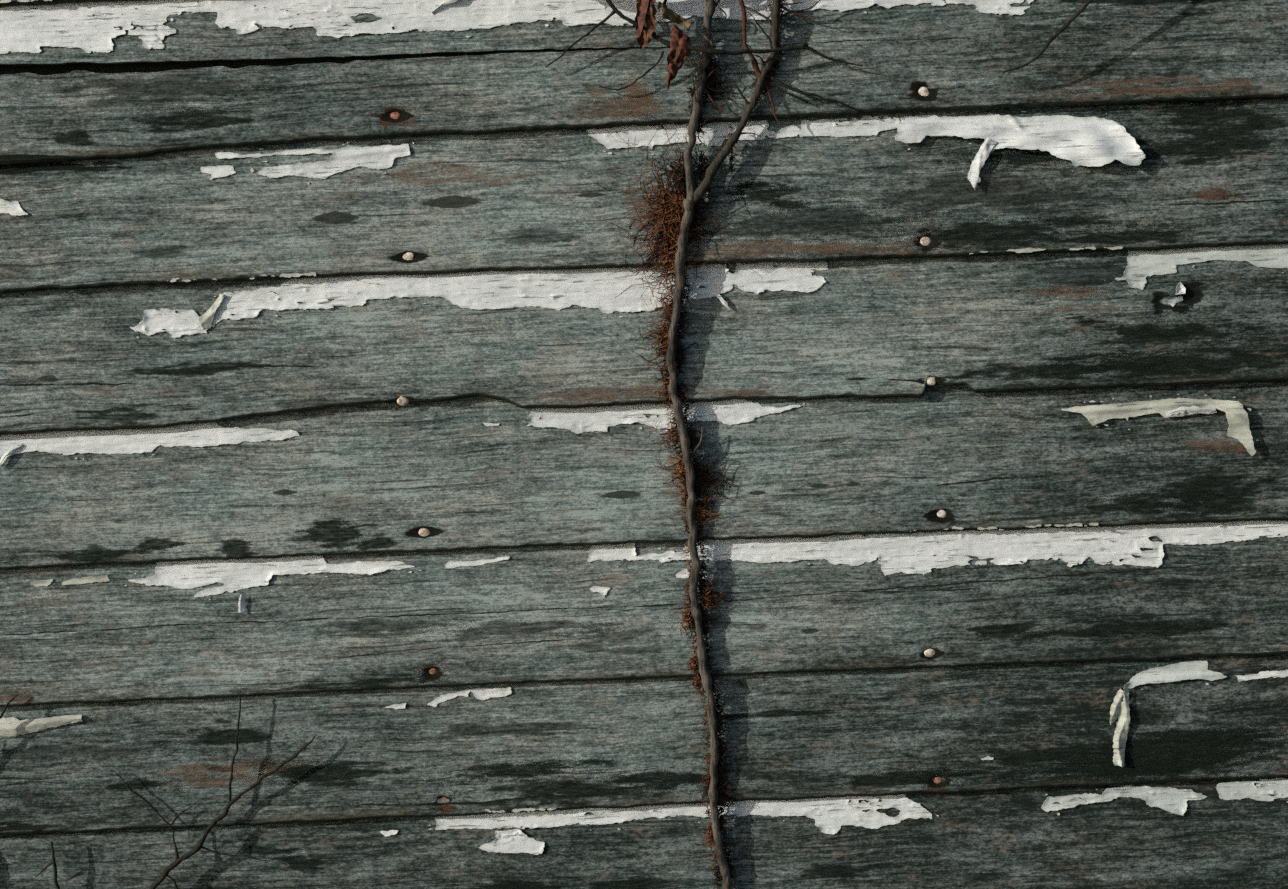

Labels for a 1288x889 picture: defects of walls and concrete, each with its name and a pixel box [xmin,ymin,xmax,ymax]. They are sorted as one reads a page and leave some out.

peeling [0,0,637,54]
peeling [200,141,414,184]
peeling [587,111,1145,190]
peeling [130,261,828,338]
peeling [0,422,300,466]
peeling [526,399,805,434]
peeling [1061,394,1256,456]
peeling [587,520,1288,580]
peeling [125,556,421,613]
peeling [1110,659,1288,767]
peeling [429,794,939,855]
peeling [1041,778,1288,816]